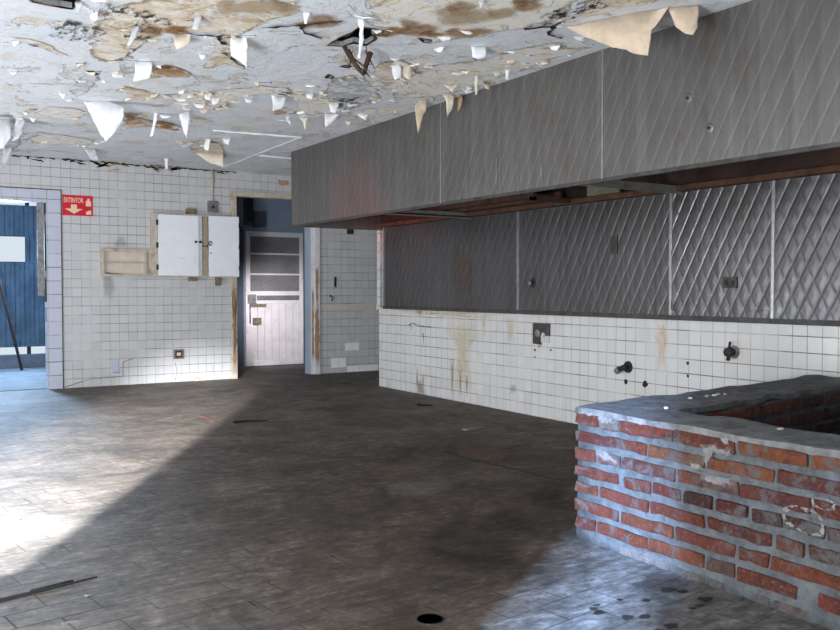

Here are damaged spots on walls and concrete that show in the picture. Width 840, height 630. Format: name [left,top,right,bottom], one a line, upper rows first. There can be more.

damp [93,3,171,42]
damp [219,1,299,14]
damp [438,5,513,24]
damp [532,0,607,27]
peeling [0,0,699,173]
crack [12,155,236,174]
rust [312,271,320,362]